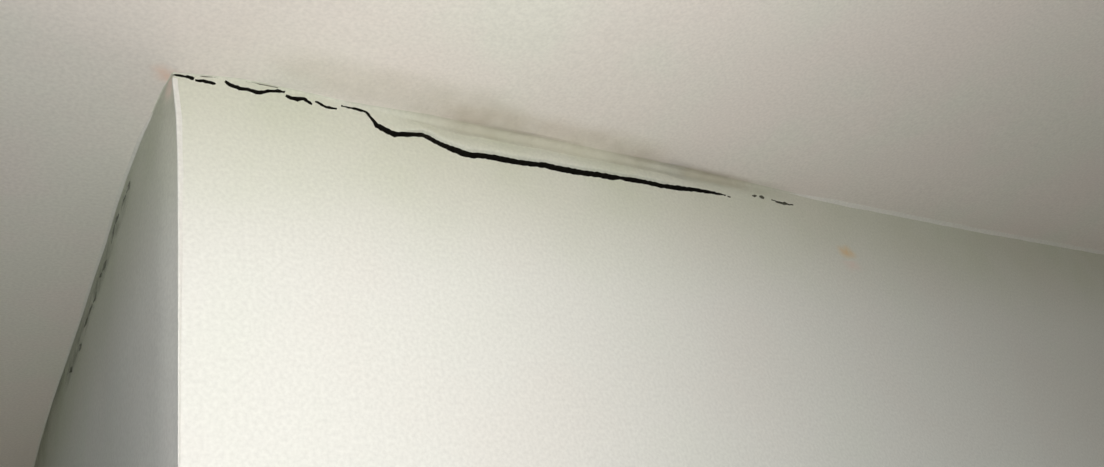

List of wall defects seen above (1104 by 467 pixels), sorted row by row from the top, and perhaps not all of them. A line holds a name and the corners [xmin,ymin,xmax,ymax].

crack [173,74,793,205]